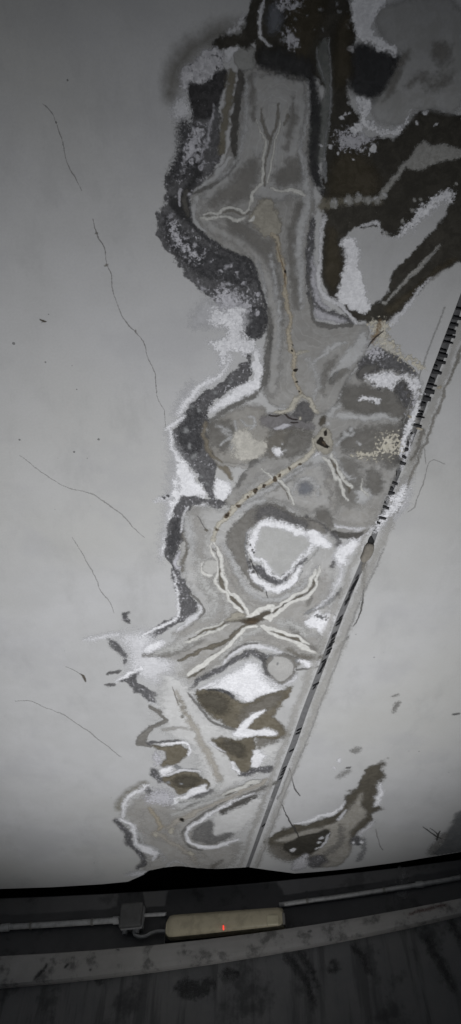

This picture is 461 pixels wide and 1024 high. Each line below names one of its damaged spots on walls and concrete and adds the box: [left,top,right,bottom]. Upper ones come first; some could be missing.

peeling [366,316,426,371]
water stain [83,0,461,877]
spalling [313,427,333,458]
peeling [350,430,404,463]
crack [25,459,144,537]
crack [148,103,369,863]
crack [23,700,119,756]